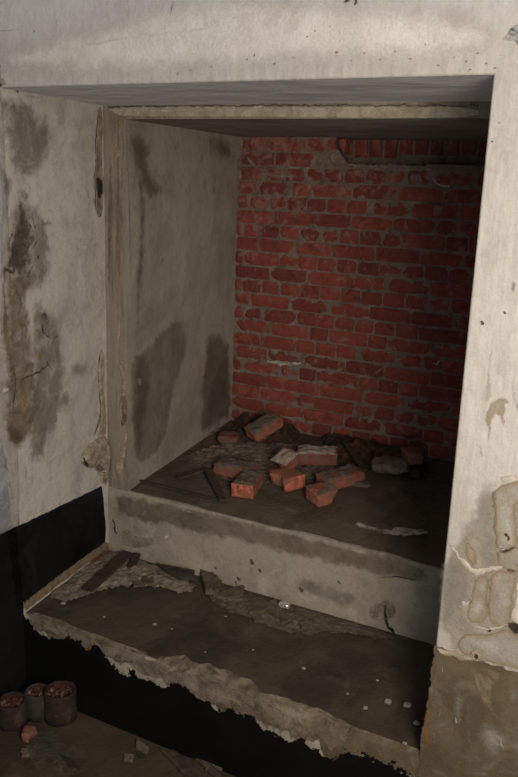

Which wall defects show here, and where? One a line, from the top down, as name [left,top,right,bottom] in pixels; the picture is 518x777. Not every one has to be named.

peeling [503,25,518,43]
water stain [2,103,47,172]
water stain [3,205,66,454]
water stain [202,338,230,429]
peeling [21,476,518,777]